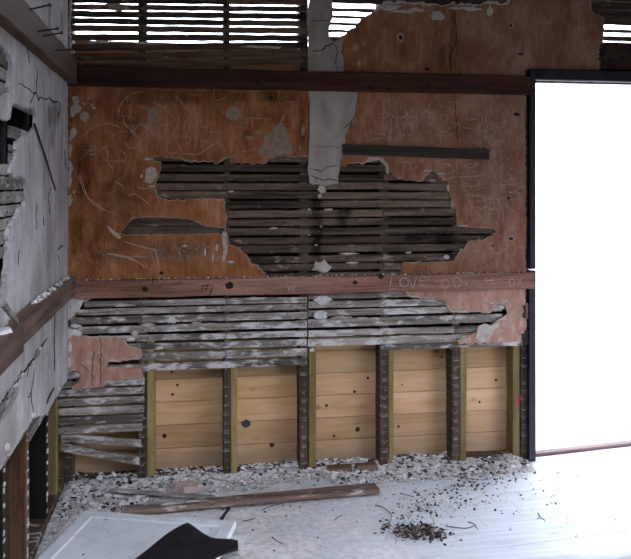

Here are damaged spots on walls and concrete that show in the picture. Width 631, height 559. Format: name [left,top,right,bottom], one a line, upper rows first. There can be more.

flaking render [329,0,510,42]
crack [18,72,73,128]
flaking render [0,44,36,295]
flaking render [107,115,497,277]
crack [310,165,338,182]
crack [0,315,55,412]
crack [81,335,102,385]
flaking render [0,292,529,469]